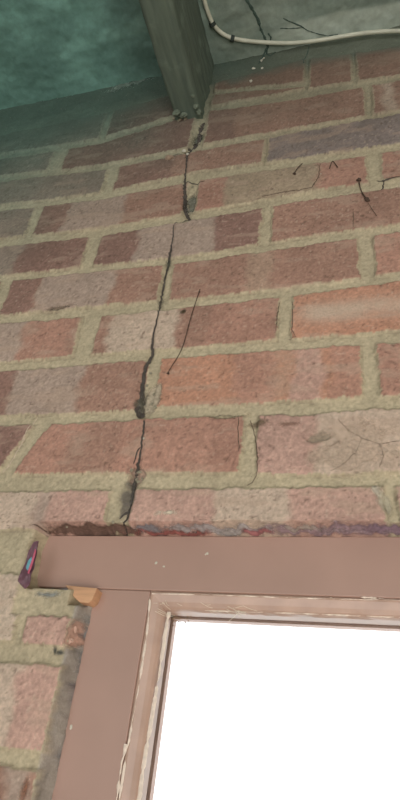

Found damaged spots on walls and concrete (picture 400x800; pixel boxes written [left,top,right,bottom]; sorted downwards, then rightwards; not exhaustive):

crack [120,123,205,536]